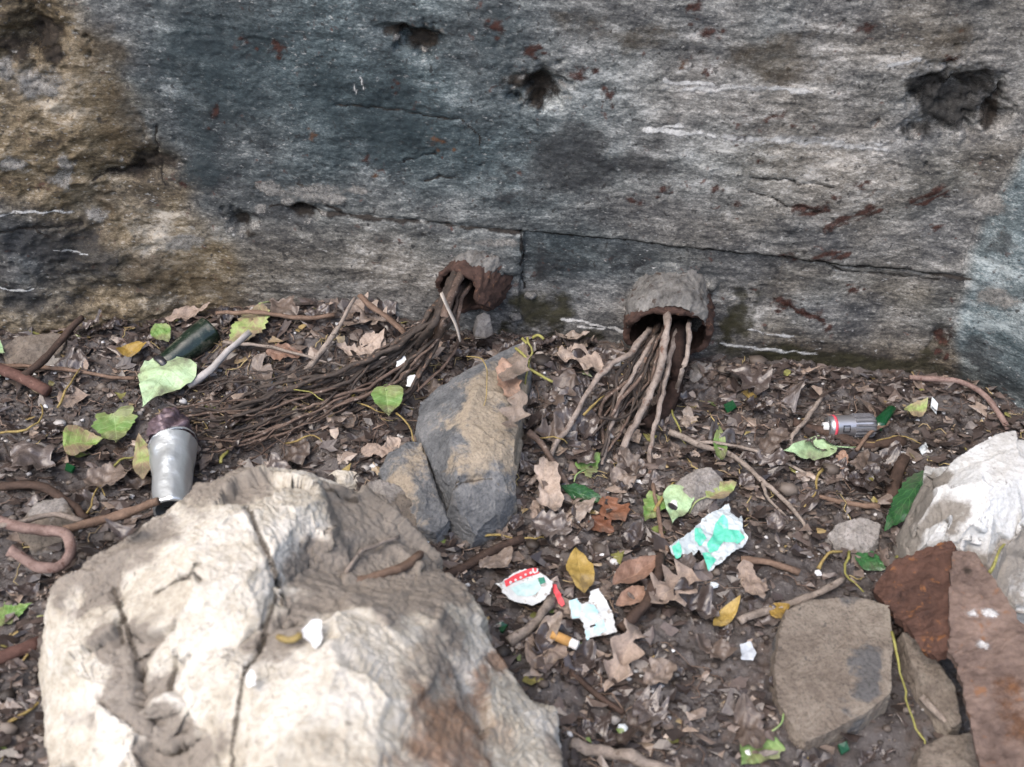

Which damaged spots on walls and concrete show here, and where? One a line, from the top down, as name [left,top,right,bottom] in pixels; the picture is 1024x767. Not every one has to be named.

spalling [384,23,444,52]
spalling [502,67,572,111]
spalling [891,55,1003,142]
crack [749,177,834,214]
corrosion [791,195,883,233]
corrosion [909,185,950,206]
crack [269,183,972,289]
corrosion [774,296,832,332]